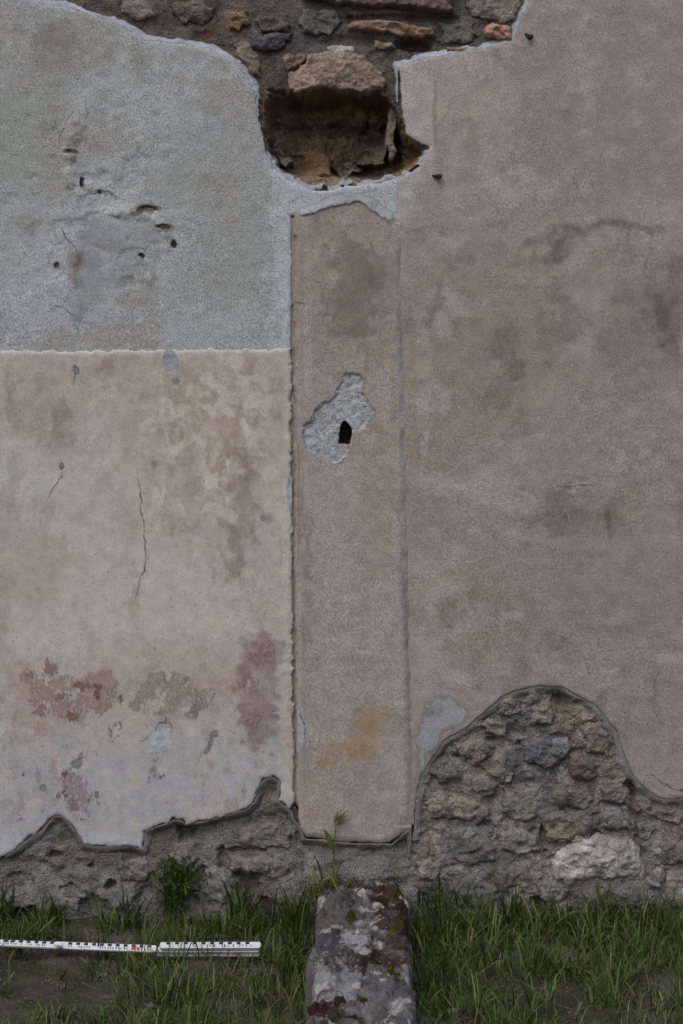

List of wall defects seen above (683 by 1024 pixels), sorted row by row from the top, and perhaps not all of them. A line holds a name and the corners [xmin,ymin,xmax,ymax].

flaking render [32,0,529,191]
spalling [302,372,376,464]
flaking render [0,686,683,924]